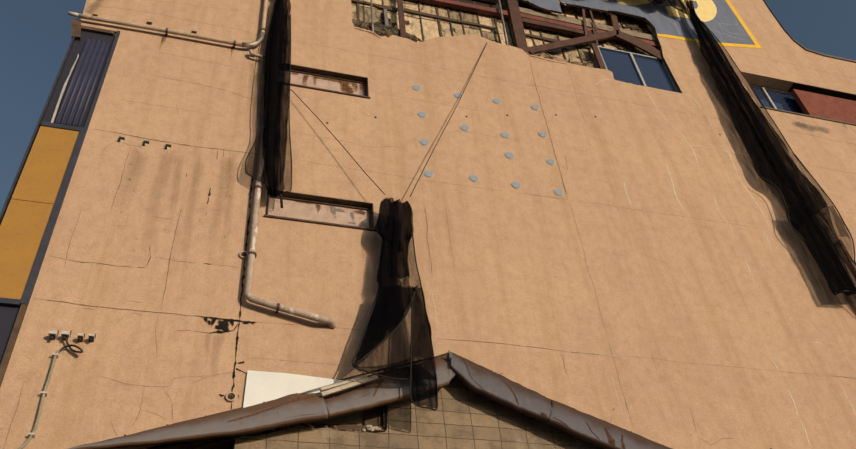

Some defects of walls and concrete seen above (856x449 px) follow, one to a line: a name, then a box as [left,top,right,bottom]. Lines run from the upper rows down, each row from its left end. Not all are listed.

corrosion [291,72,364,93]
crack [95,129,247,205]
crack [645,88,772,251]
crack [35,178,253,409]